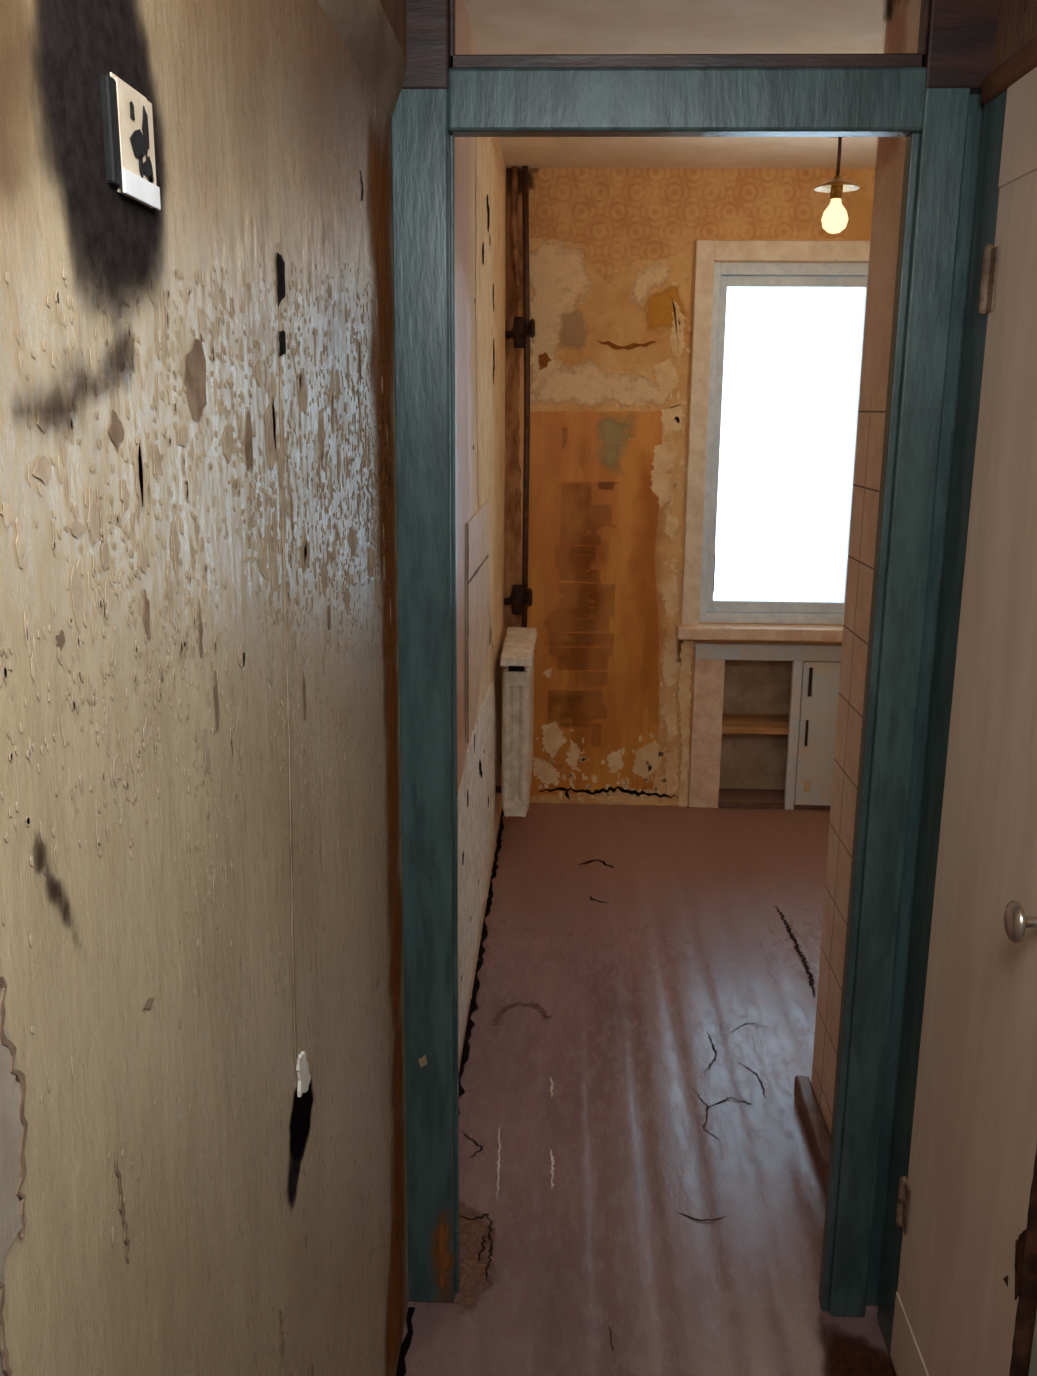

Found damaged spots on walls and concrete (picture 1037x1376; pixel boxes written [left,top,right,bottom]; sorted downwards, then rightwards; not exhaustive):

peeling [0,260,392,946]
crack [539,786,678,800]
peeling [529,240,693,807]
peeling [0,959,51,1376]
spalling [288,1051,314,1207]